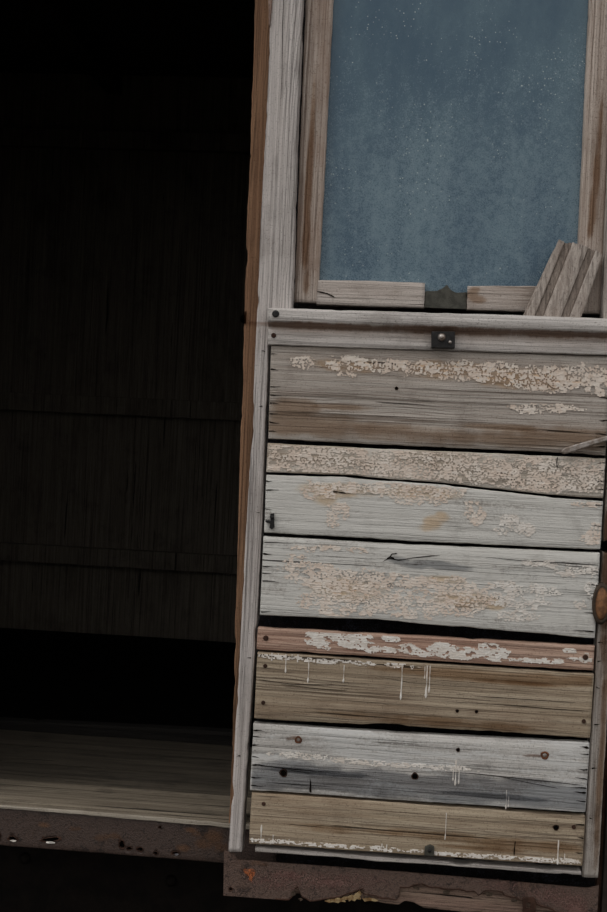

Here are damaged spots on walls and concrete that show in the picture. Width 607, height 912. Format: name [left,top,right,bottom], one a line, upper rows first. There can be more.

peeling [290,355,607,414]
peeling [267,444,604,528]
peeling [581,522,601,545]
peeling [277,545,563,622]
peeling [521,560,598,610]
peeling [258,632,593,670]
corrosion [275,883,522,903]